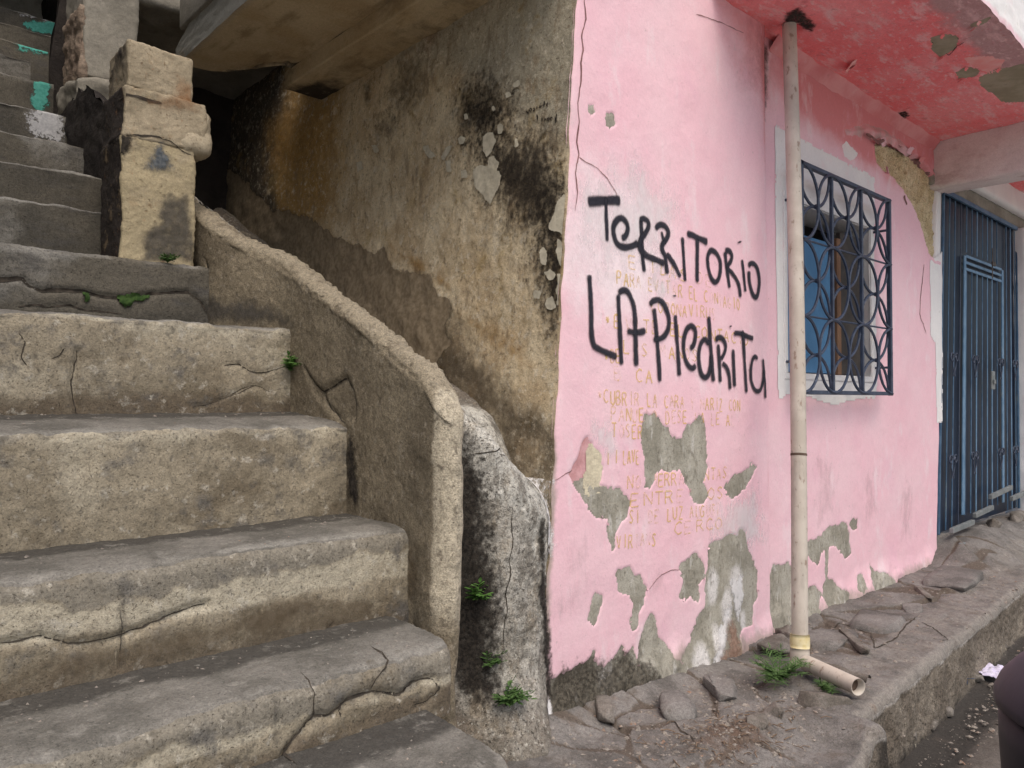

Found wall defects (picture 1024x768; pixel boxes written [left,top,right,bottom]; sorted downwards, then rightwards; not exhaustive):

crack [575,0,617,210]
flaking render [423,124,503,204]
damp [536,167,564,335]
damp [206,296,289,324]
crack [194,364,357,423]
damp [346,435,359,504]
peeling [641,413,709,504]
peeling [724,462,757,499]
peeling [808,518,896,617]
crack [1,603,205,665]
peeling [547,529,791,716]
crack [282,646,440,764]